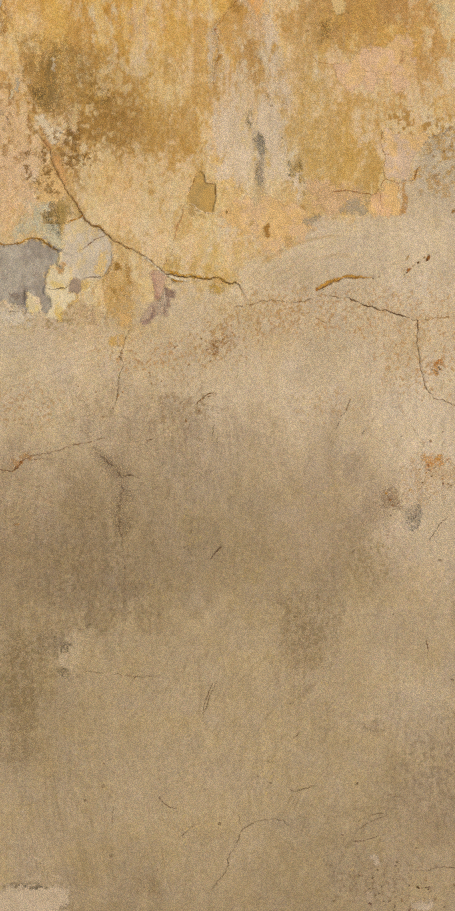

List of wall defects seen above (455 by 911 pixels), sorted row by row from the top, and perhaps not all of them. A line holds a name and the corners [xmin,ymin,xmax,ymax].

peeling [34,102,81,144]
leakage [0,0,168,249]
leakage [197,0,368,226]
leakage [298,0,428,62]
spalling [0,217,114,323]
spalling [139,269,177,327]
crack [37,131,451,403]
crack [0,438,136,617]
leakage [0,362,219,781]